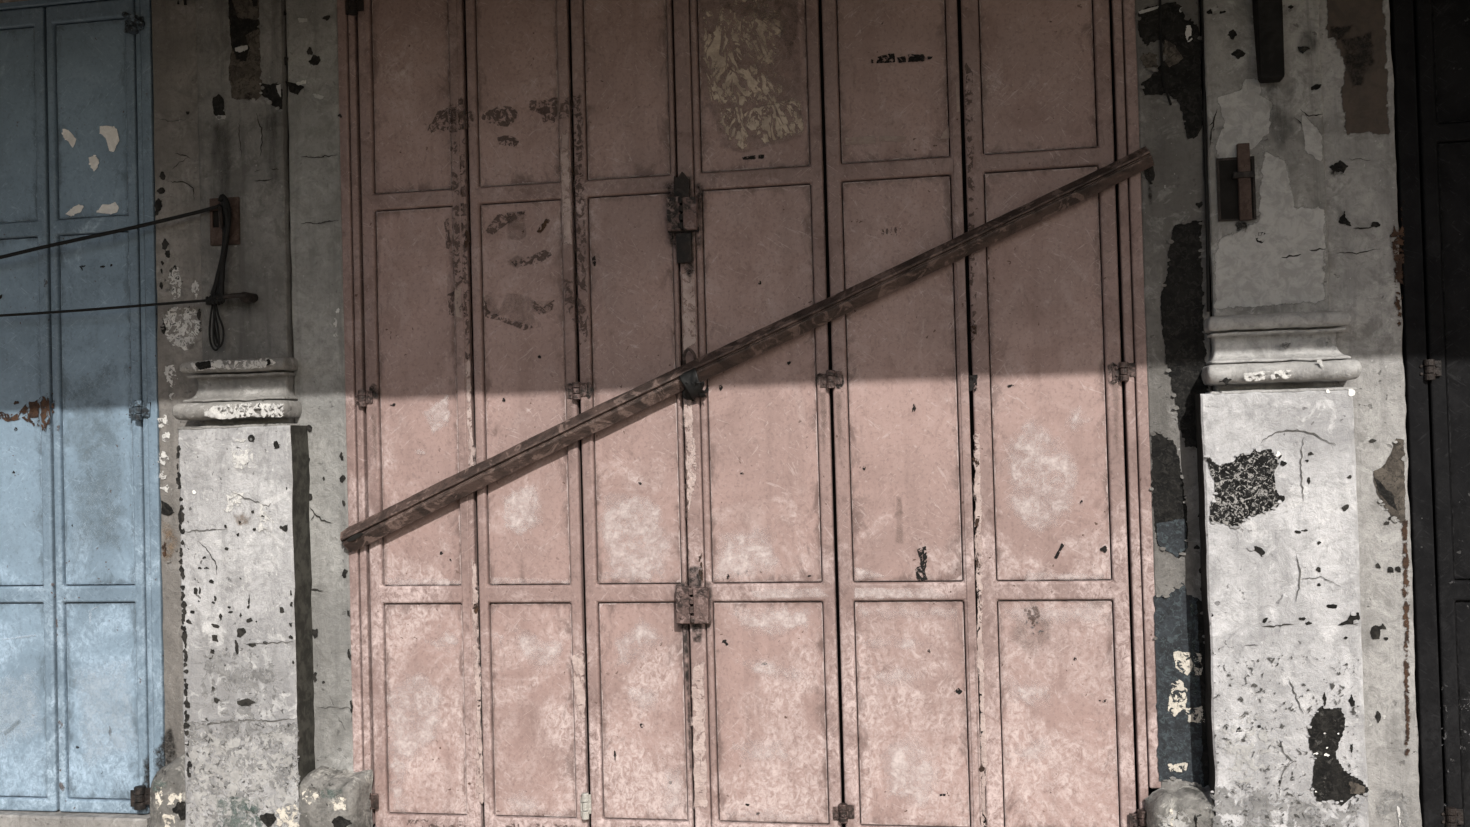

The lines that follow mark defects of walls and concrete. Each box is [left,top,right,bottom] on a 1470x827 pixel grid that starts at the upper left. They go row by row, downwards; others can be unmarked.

flaking render [212,0,324,120]
peeling [1326,0,1391,135]
peeling [154,172,166,216]
peeling [1136,2,1351,558]
peeling [153,238,352,827]
flaking render [1369,438,1408,525]
peeling [1154,568,1413,827]